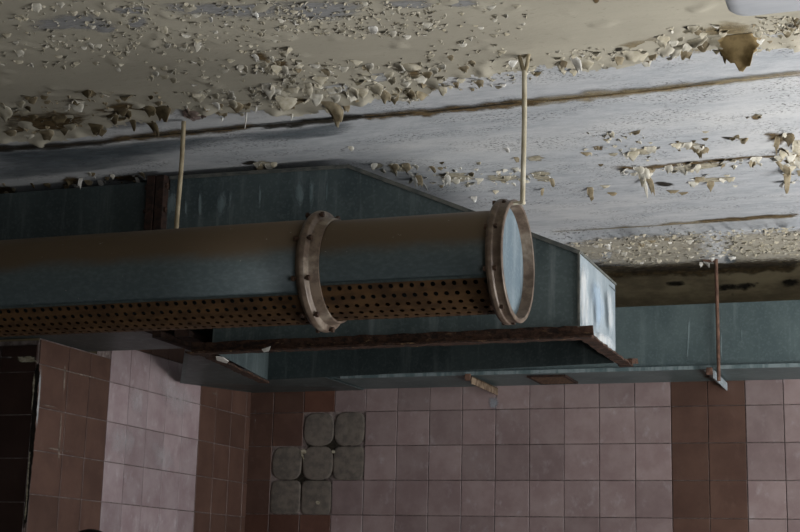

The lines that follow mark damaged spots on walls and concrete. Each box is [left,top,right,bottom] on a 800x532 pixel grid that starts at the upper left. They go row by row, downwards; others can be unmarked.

peeling [0,0,543,141]
peeling [548,16,800,76]
peeling [371,148,555,202]
peeling [581,130,800,201]
peeling [569,227,800,267]
leakage [595,257,800,291]